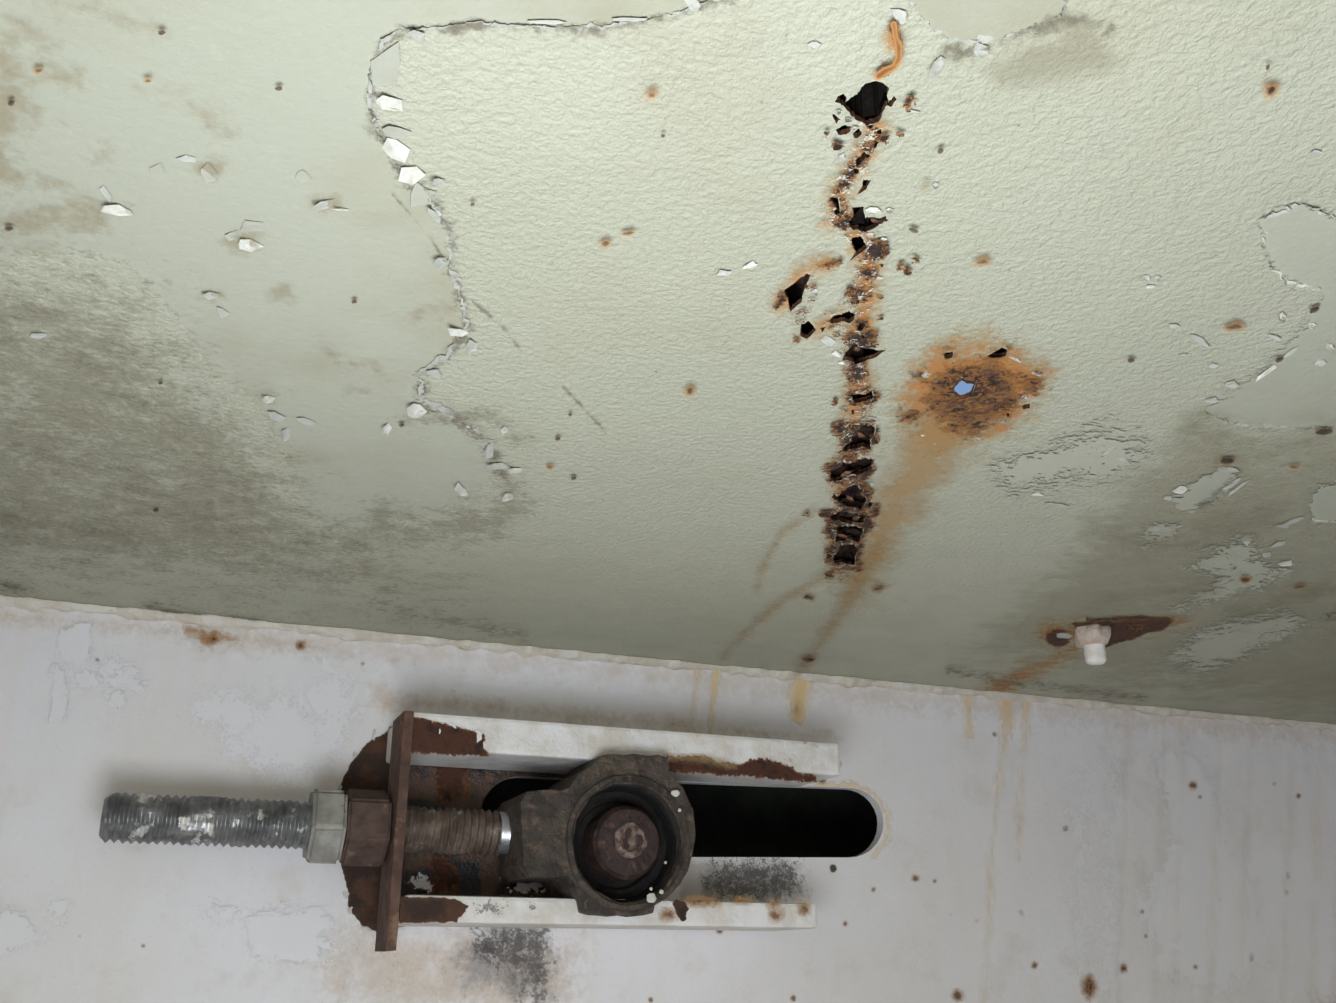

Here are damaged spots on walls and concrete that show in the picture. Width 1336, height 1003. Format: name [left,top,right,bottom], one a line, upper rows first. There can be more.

peeling [890,0,1084,76]
peeling [0,0,719,538]
peeling [717,261,758,276]
peeling [1203,202,1336,433]
corrosion [826,337,1052,593]
peeling [1134,464,1249,554]
peeling [1158,479,1336,681]
corrosion [953,615,1187,736]
corrosion [1083,976,1096,998]